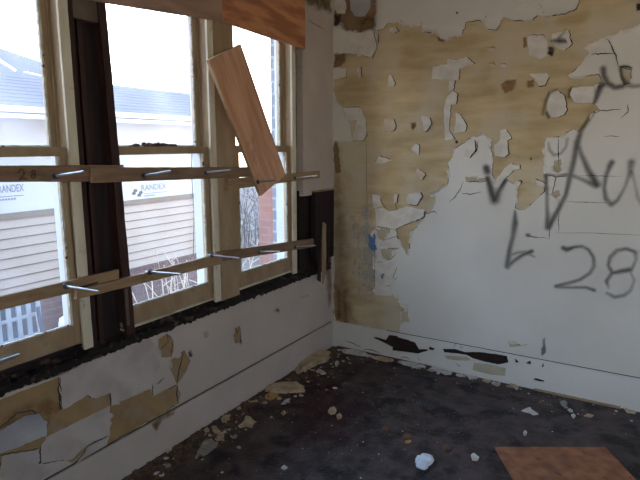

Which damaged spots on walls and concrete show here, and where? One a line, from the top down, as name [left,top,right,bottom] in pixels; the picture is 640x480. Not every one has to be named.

peeling [333,0,640,333]
peeling [0,334,190,480]